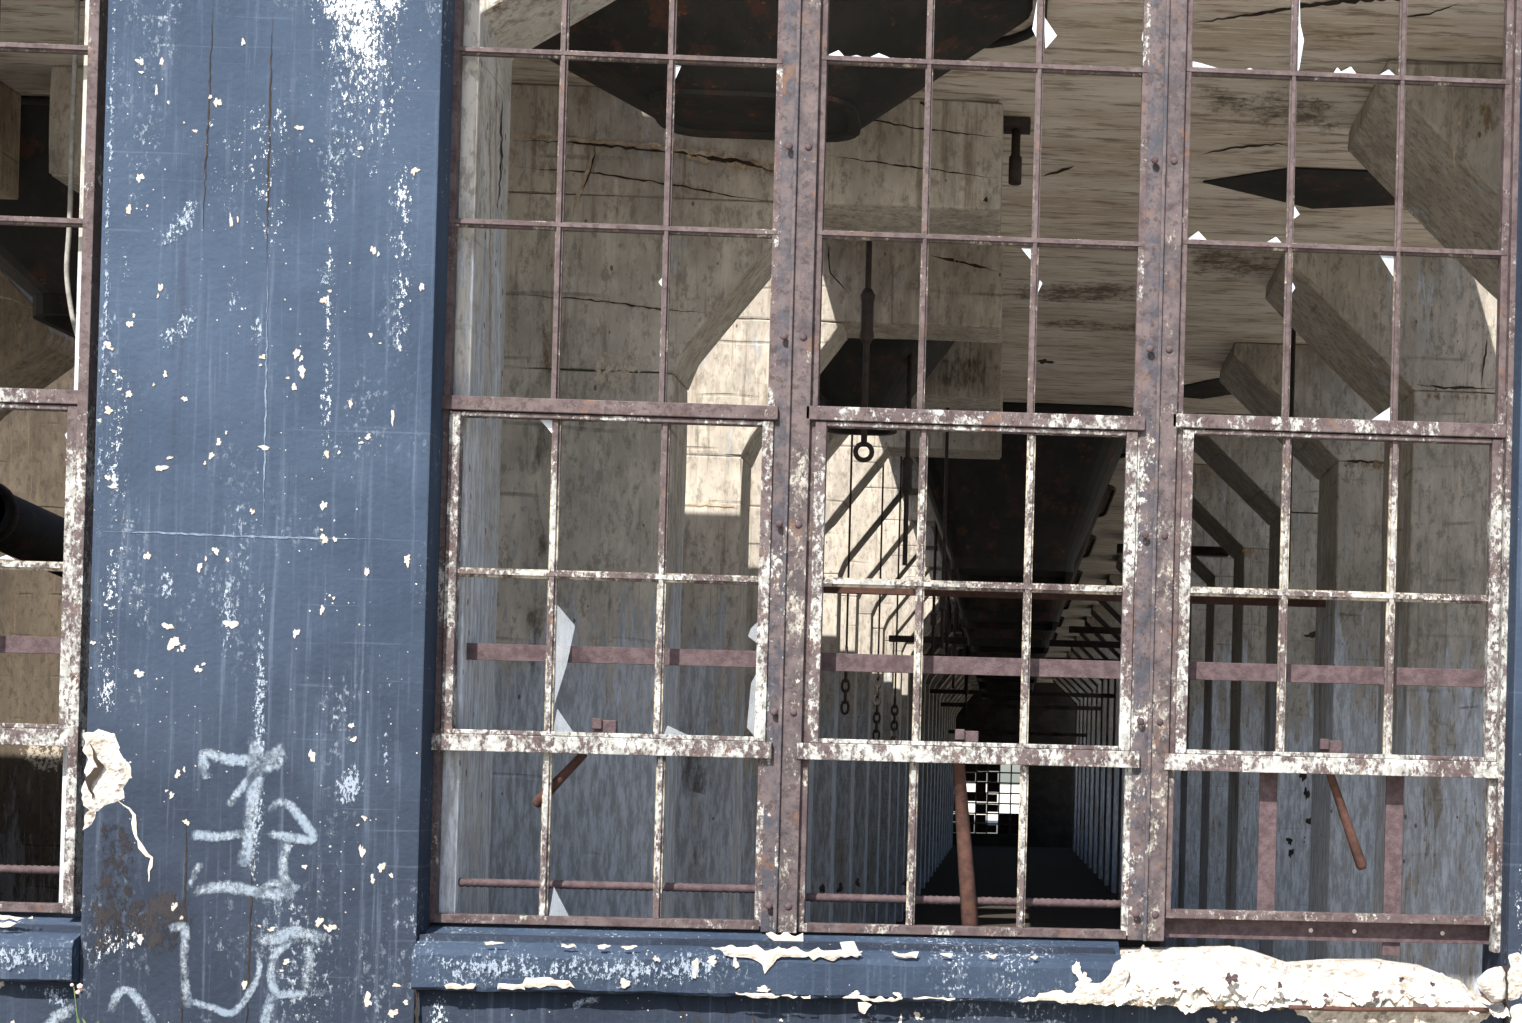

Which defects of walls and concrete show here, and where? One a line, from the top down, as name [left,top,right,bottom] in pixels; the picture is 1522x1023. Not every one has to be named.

crack [1194,0,1459,39]
peeling [135,57,170,104]
peeling [286,348,306,390]
peeling [320,501,337,544]
peeling [162,623,186,652]
peeling [359,844,393,884]
peeling [819,878,860,893]
peeling [0,915,33,928]
peeling [497,977,574,990]
peeling [692,932,955,1023]
spalling [1018,945,1522,1023]